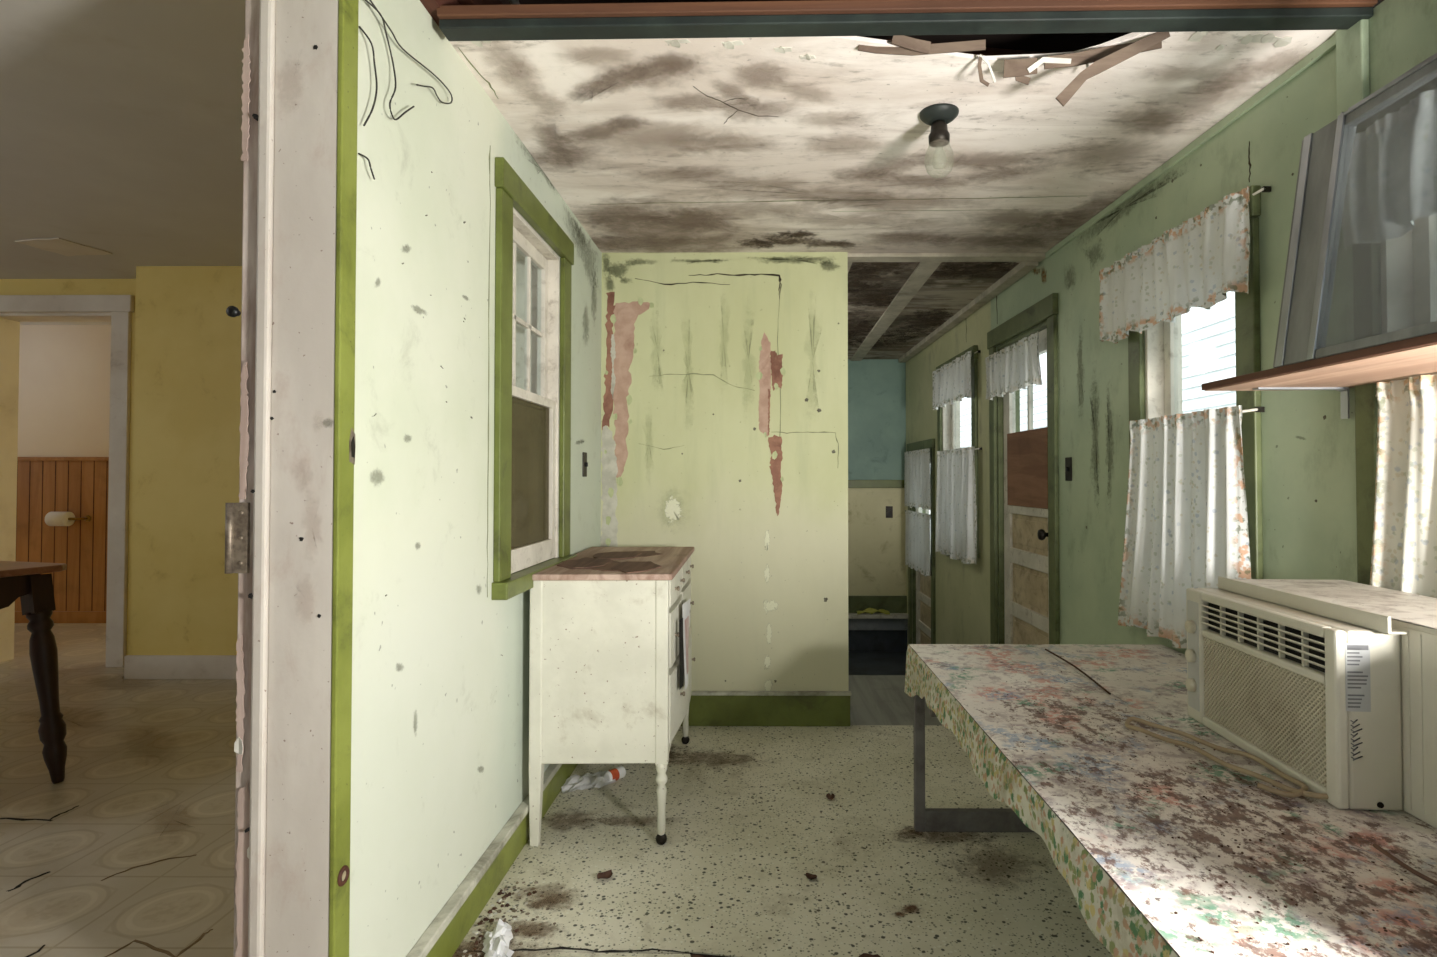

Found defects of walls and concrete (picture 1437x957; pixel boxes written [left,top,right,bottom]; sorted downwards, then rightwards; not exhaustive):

water stain [739,231,853,248]
water stain [933,262,1011,278]
water stain [848,262,953,350]
peeling [601,292,654,547]
peeling [753,332,786,516]
crack [0,806,78,821]
crack [101,854,197,881]
crack [8,871,50,892]
crack [105,929,213,957]
crack [466,946,693,954]